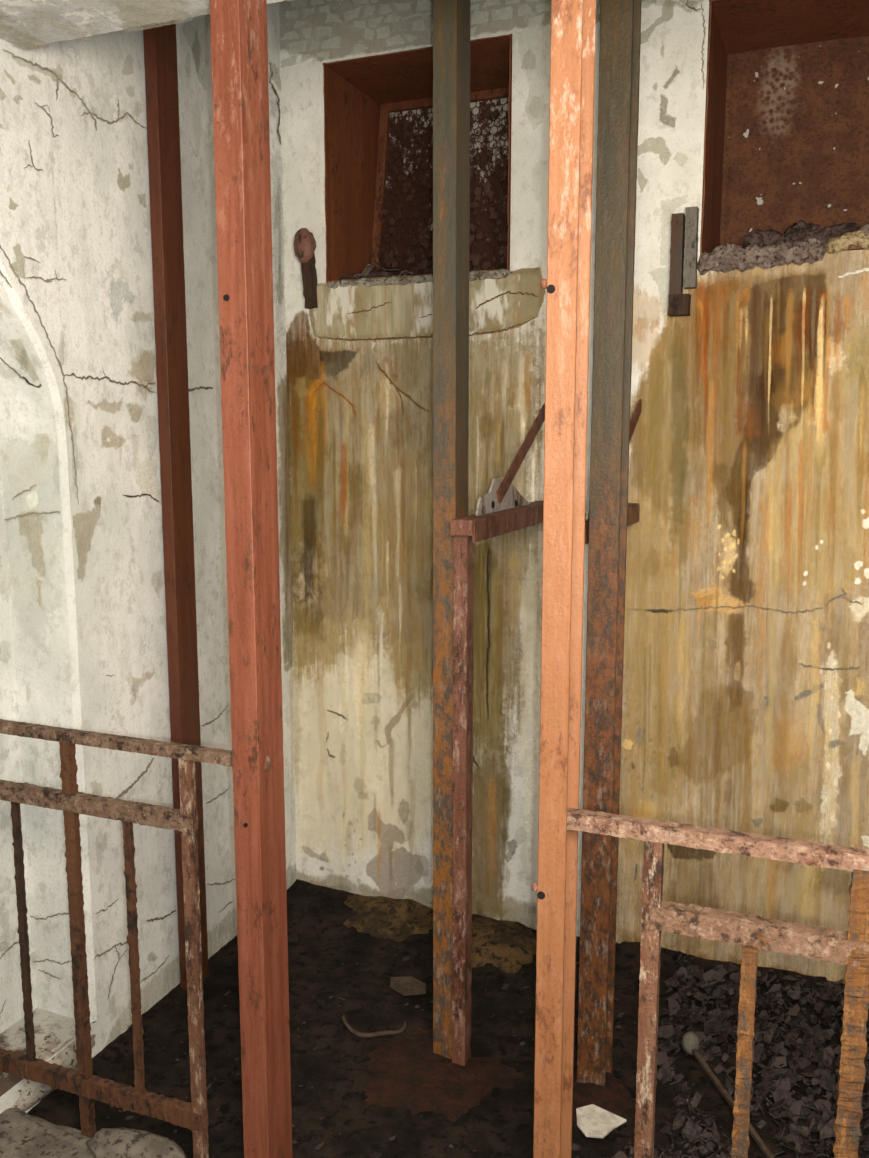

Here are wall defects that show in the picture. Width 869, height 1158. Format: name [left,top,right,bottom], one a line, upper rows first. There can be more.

crack [3,50,147,171]
peeling [654,70,679,127]
peeling [11,244,66,282]
peeling [652,266,670,308]
peeling [826,224,869,254]
crack [0,245,159,521]
damp [468,320,544,516]
damp [279,335,433,702]
damp [619,249,869,849]
crack [632,588,861,614]
damp [662,843,852,931]
crack [0,942,170,998]